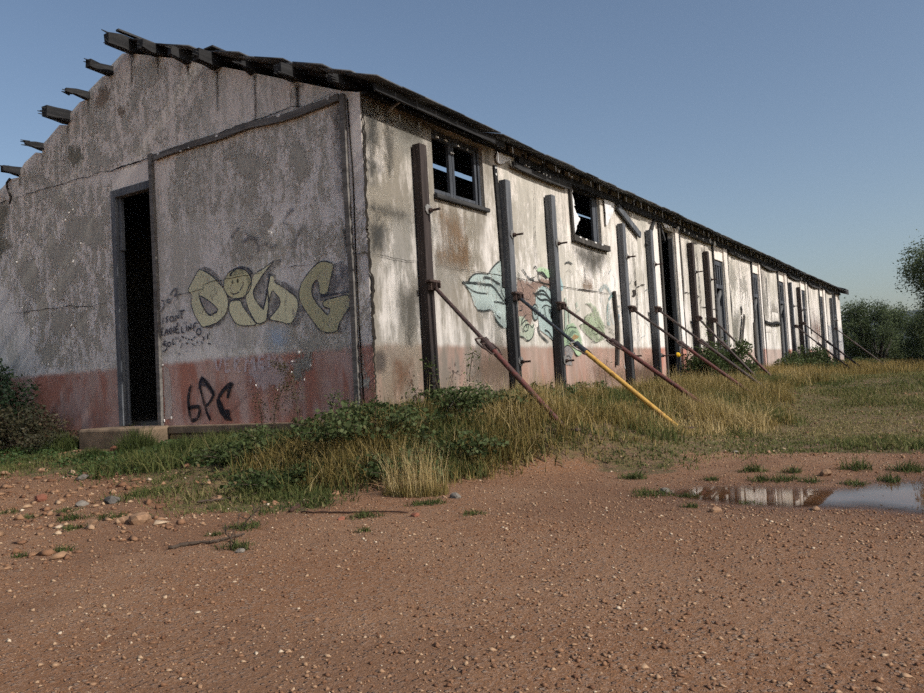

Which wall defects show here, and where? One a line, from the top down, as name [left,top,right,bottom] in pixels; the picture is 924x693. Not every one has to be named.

leakage [366,99,392,172]
peeling [0,59,373,391]
leakage [371,226,384,250]
crack [354,91,411,401]
crack [437,231,613,295]
leakage [403,293,415,343]